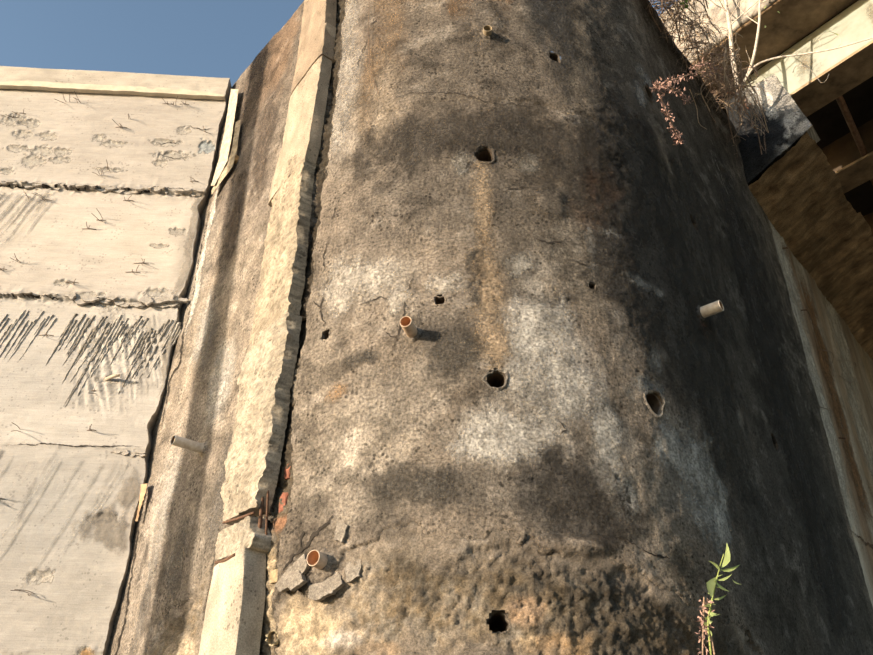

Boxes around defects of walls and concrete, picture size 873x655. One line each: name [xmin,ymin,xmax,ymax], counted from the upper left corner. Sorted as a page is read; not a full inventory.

spalling [0,113,215,197]
spalling [4,279,190,311]
crack [313,204,337,325]
damp [343,350,376,365]
damp [324,257,408,313]
spalling [222,0,761,655]
damp [353,98,755,547]
damp [770,224,847,497]
spalling [146,536,235,655]
crack [282,515,333,576]